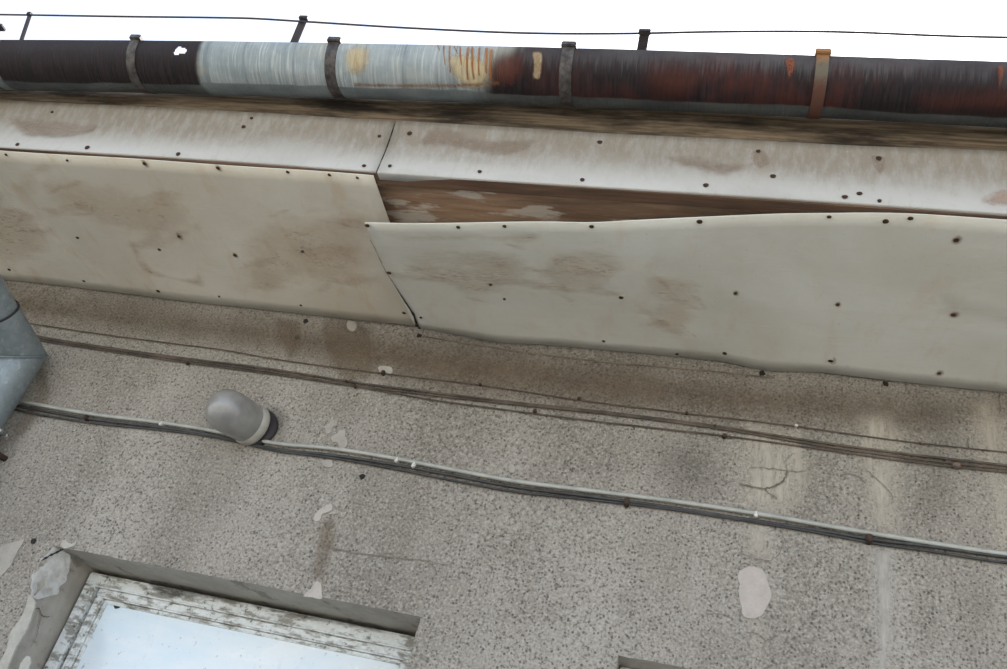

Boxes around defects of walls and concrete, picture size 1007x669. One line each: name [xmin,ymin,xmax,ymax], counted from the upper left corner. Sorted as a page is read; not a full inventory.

leakage [231,329,792,411]
crack [740,453,894,506]
spalling [0,538,77,669]
flaking render [737,566,772,619]